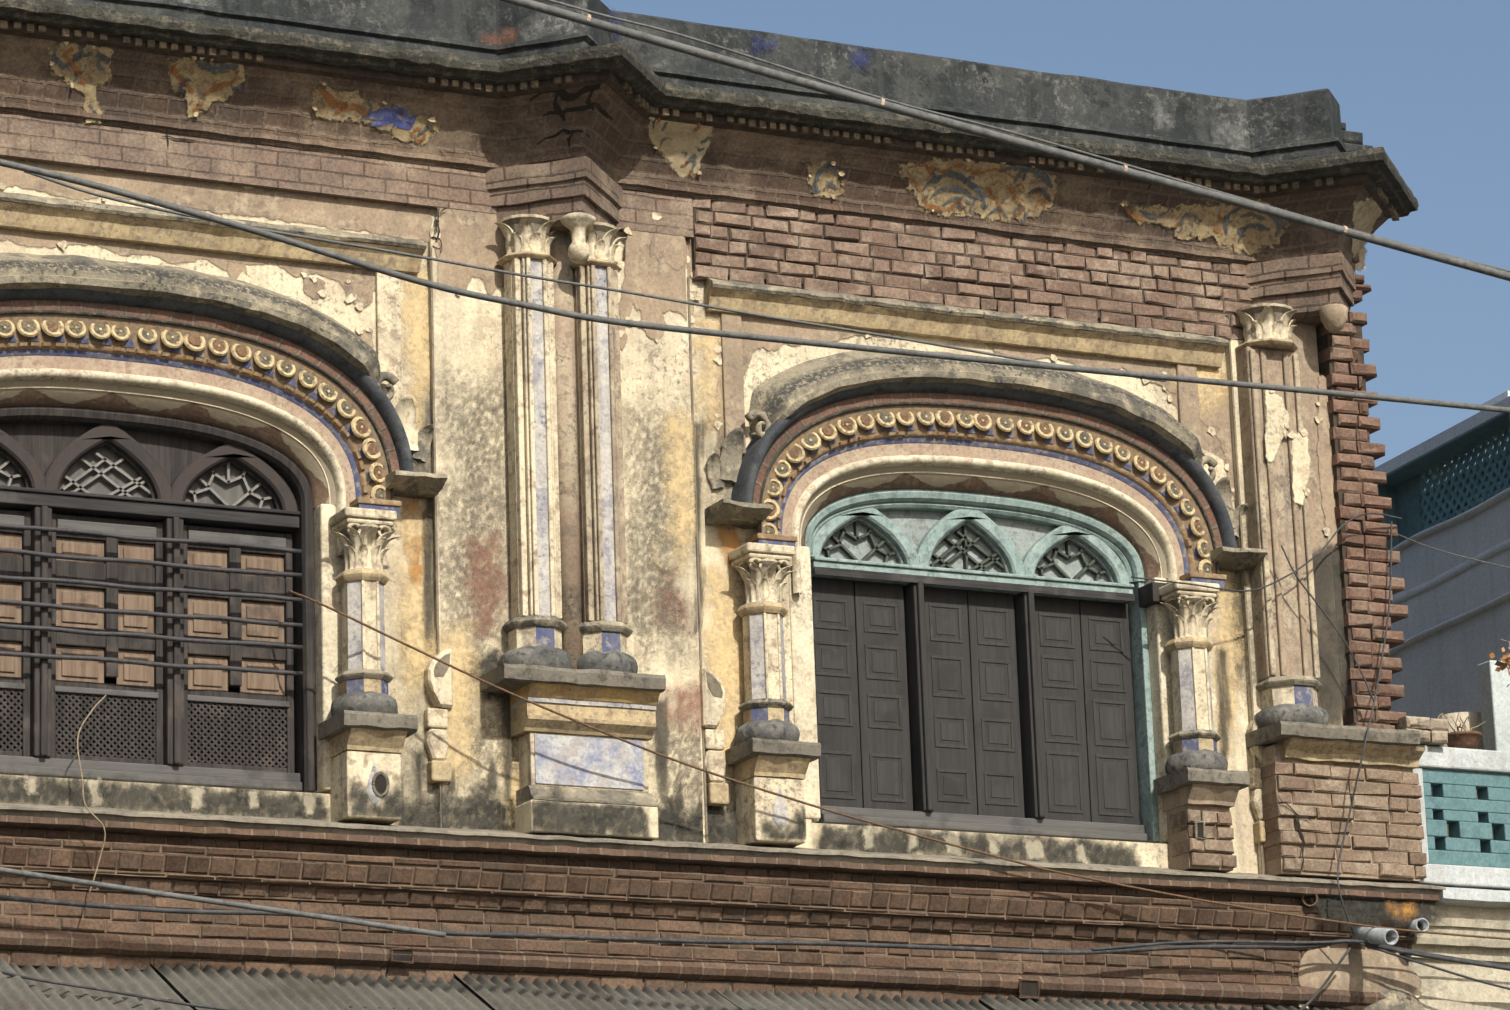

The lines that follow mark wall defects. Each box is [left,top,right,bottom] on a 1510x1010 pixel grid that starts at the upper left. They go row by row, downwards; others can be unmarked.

crack [530,84,613,147]
flaking render [0,228,376,347]
flaking render [0,158,506,297]
flaking render [713,313,724,455]
flaking render [741,316,875,384]
flaking render [619,194,1255,350]
flaking render [1282,375,1337,547]